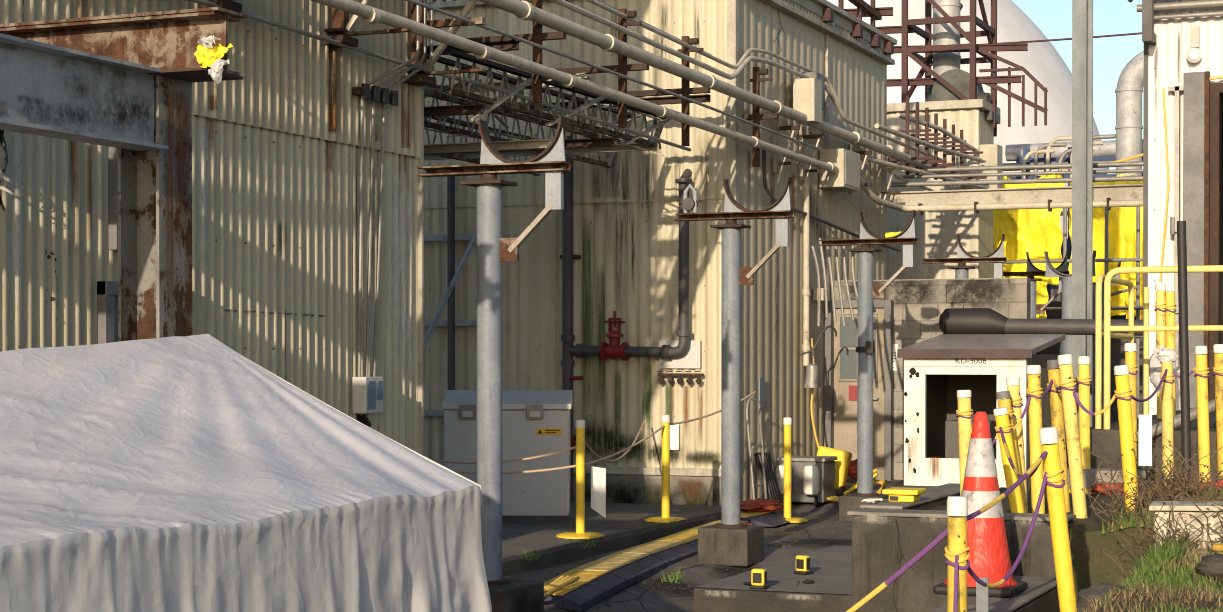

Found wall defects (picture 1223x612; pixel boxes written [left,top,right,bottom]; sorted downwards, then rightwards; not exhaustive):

corrosion [326,45,337,166]
corrosion [167,93,191,335]
water stain [582,233,621,436]
water stain [643,366,651,431]